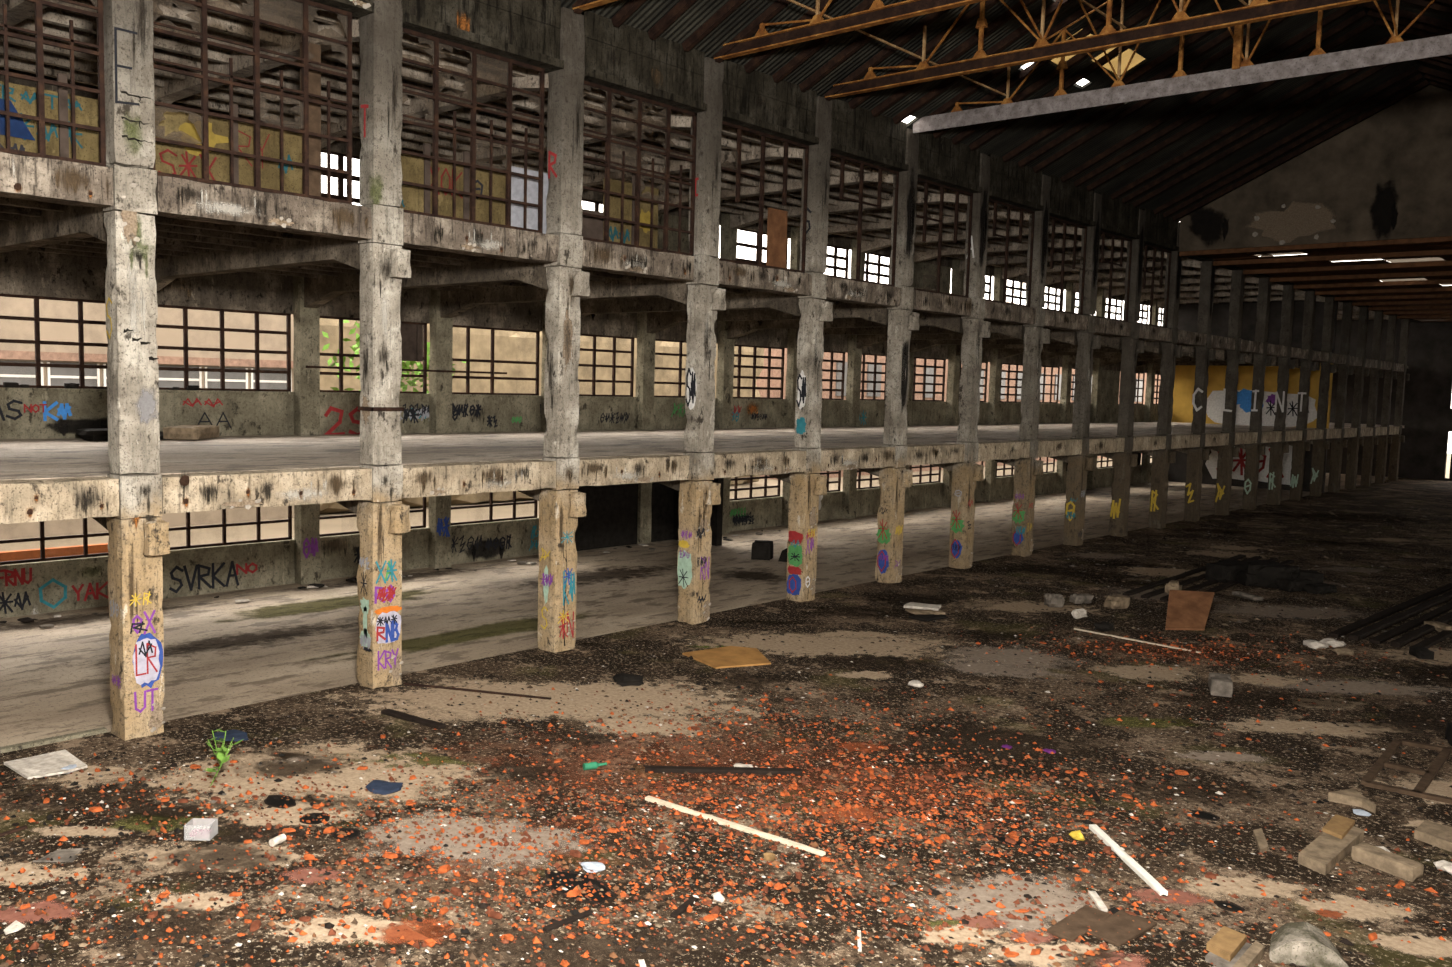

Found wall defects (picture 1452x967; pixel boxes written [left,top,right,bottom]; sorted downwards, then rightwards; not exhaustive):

water stain [55,167,88,192]
water stain [75,490,109,511]
water stain [183,484,230,504]
water stain [289,474,355,500]
water stain [378,476,393,563]